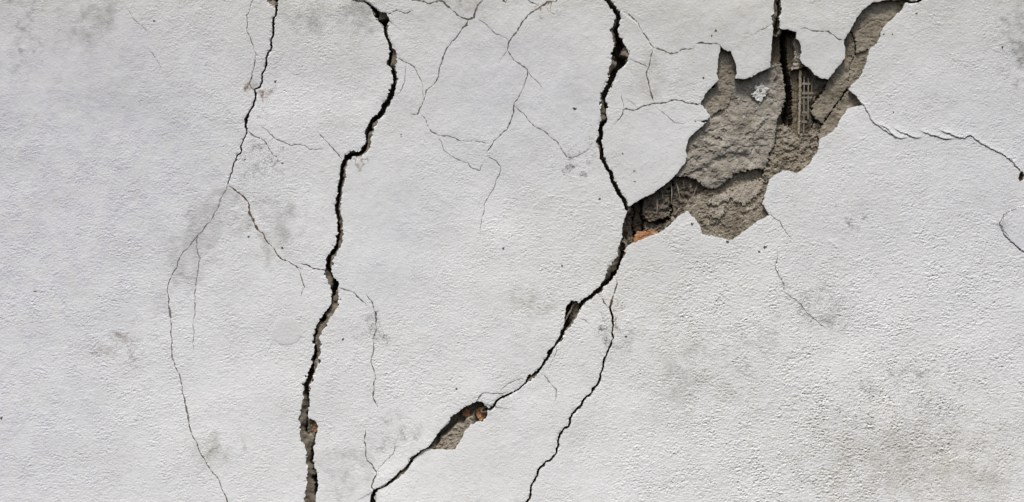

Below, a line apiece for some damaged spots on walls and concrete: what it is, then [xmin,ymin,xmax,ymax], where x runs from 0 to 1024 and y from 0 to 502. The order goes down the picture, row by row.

flaking render [619,0,907,255]
crack [863,104,1021,172]
crack [167,0,717,502]
crack [770,214,826,328]
flaking render [428,401,488,449]